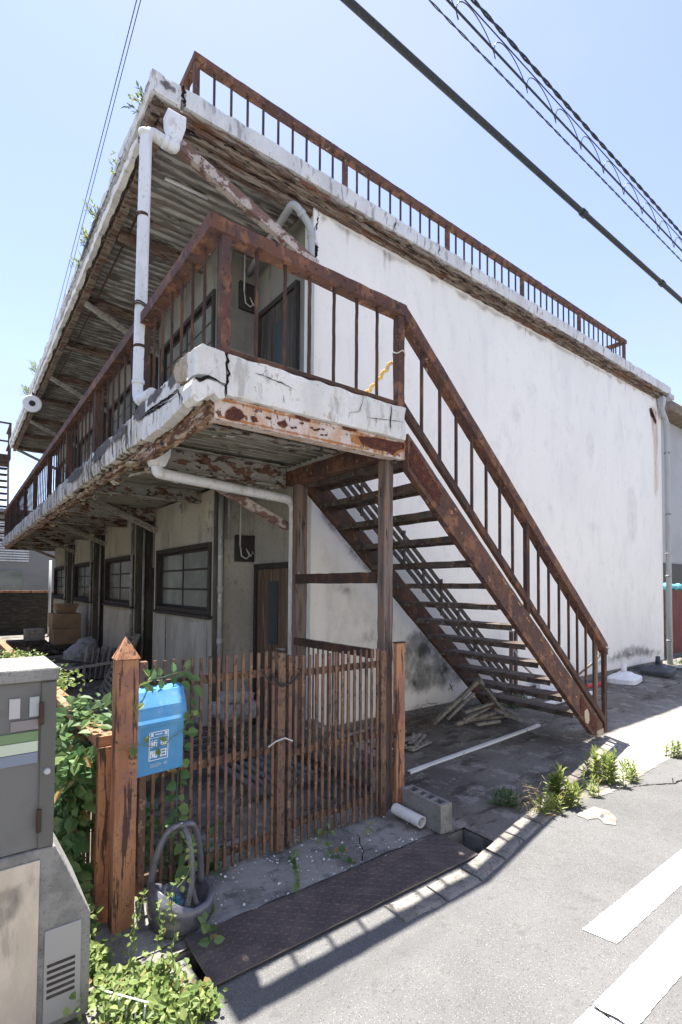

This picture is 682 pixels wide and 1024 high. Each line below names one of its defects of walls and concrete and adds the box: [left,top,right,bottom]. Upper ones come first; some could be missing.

crack [120,352,231,450]
peeling [343,426,406,457]
spalling [76,458,152,505]
damp [405,635,460,689]